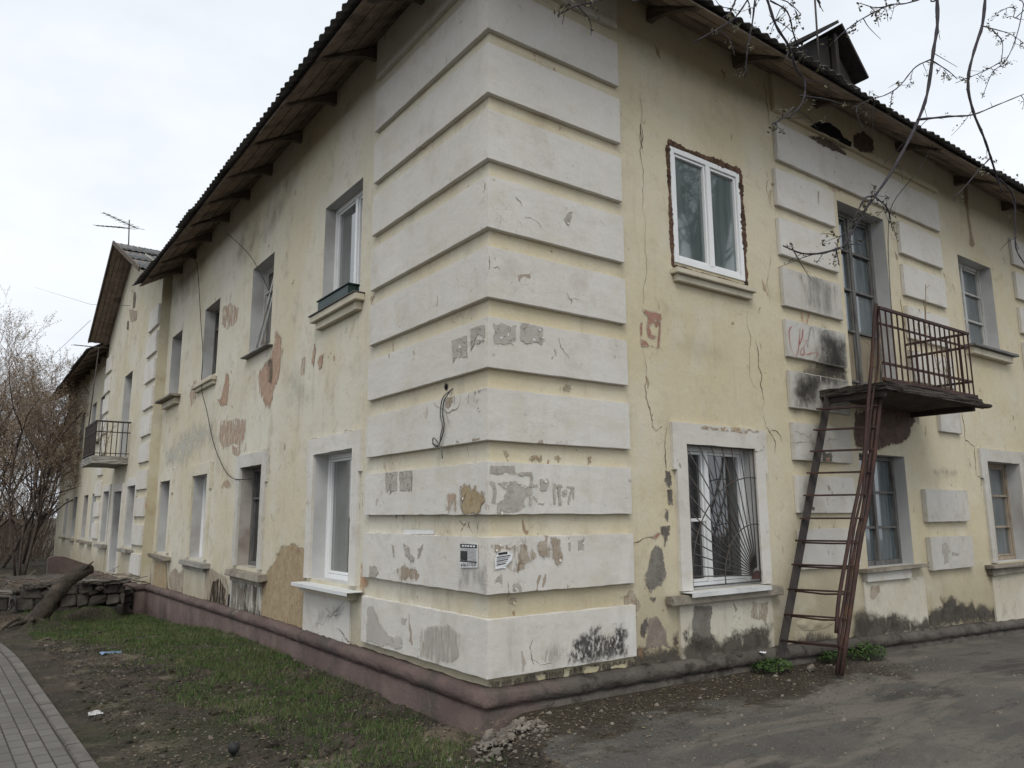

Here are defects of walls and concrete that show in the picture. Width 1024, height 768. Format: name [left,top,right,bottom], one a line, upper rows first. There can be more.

flaking render [665,139,748,286]
flaking render [258,330,283,409]
crack [643,353,667,470]
crack [747,325,838,452]
leakage [796,333,845,402]
flaking render [854,408,920,450]
peeling [445,450,575,514]
peeling [261,543,306,628]
peeling [491,537,585,604]
flaking render [624,470,673,649]
leakage [854,597,995,638]
leakage [491,628,771,687]